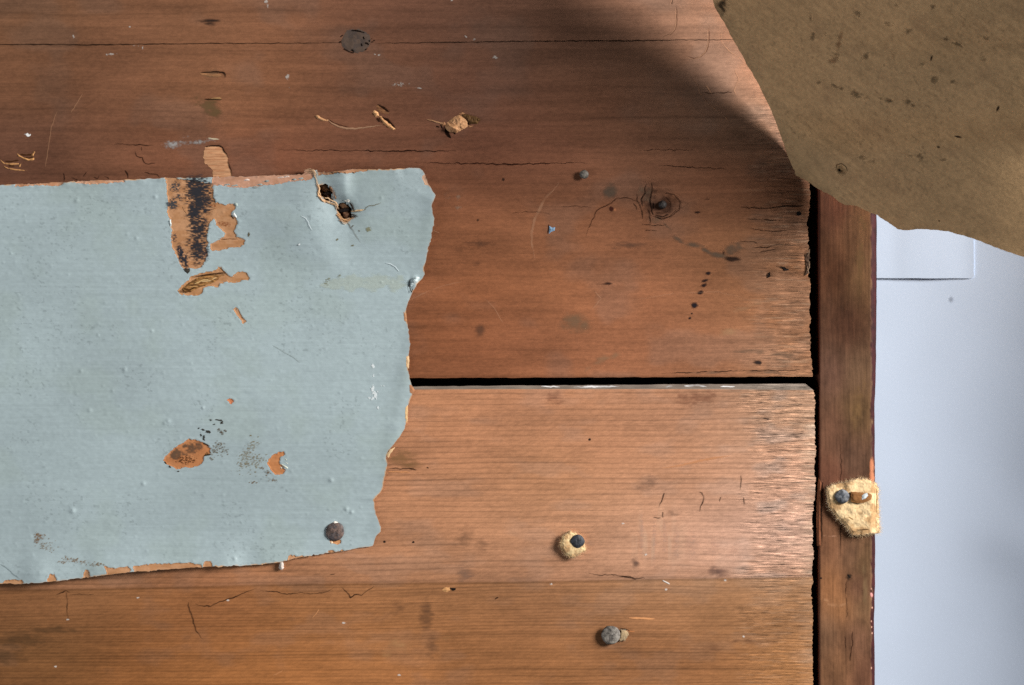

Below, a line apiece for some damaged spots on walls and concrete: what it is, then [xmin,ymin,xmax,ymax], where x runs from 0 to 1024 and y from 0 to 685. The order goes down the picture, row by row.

crack [0,40,279,48]
crack [400,37,732,45]
crack [365,150,579,165]
peeling [165,169,368,296]
peeling [163,438,211,472]
peeling [267,451,288,475]
peeling [104,561,212,575]